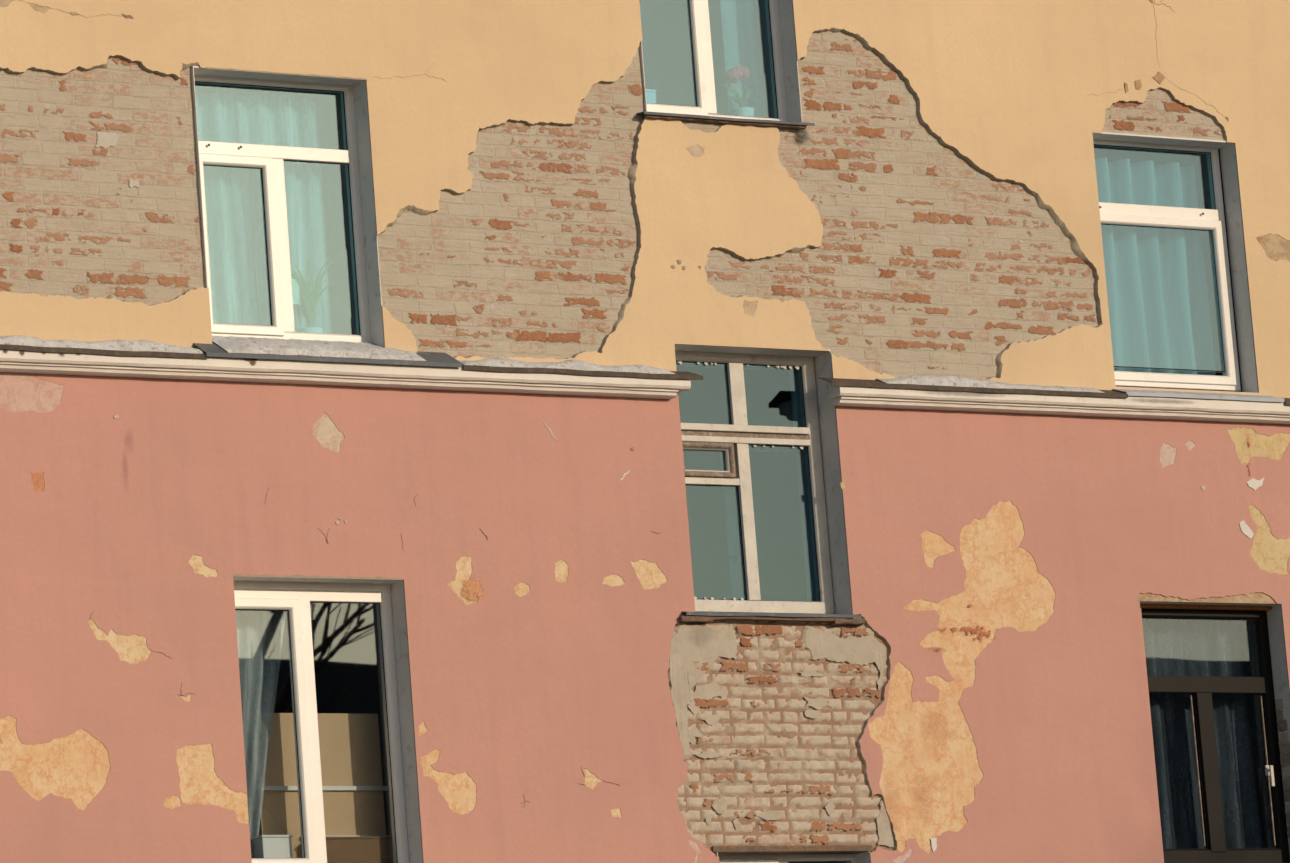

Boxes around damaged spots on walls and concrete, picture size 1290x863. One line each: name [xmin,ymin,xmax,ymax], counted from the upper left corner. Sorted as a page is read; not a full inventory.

spalling [1102,72,1229,142]
spalling [0,55,205,306]
spalling [377,41,645,359]
spalling [671,28,1102,380]
peeling [1227,427,1290,465]
peeling [87,618,151,664]
spalling [668,500,1056,863]
peeling [1138,592,1277,608]
peeling [0,715,111,811]
peeling [164,743,249,824]
peeling [421,749,477,814]
spalling [1275,698,1290,837]